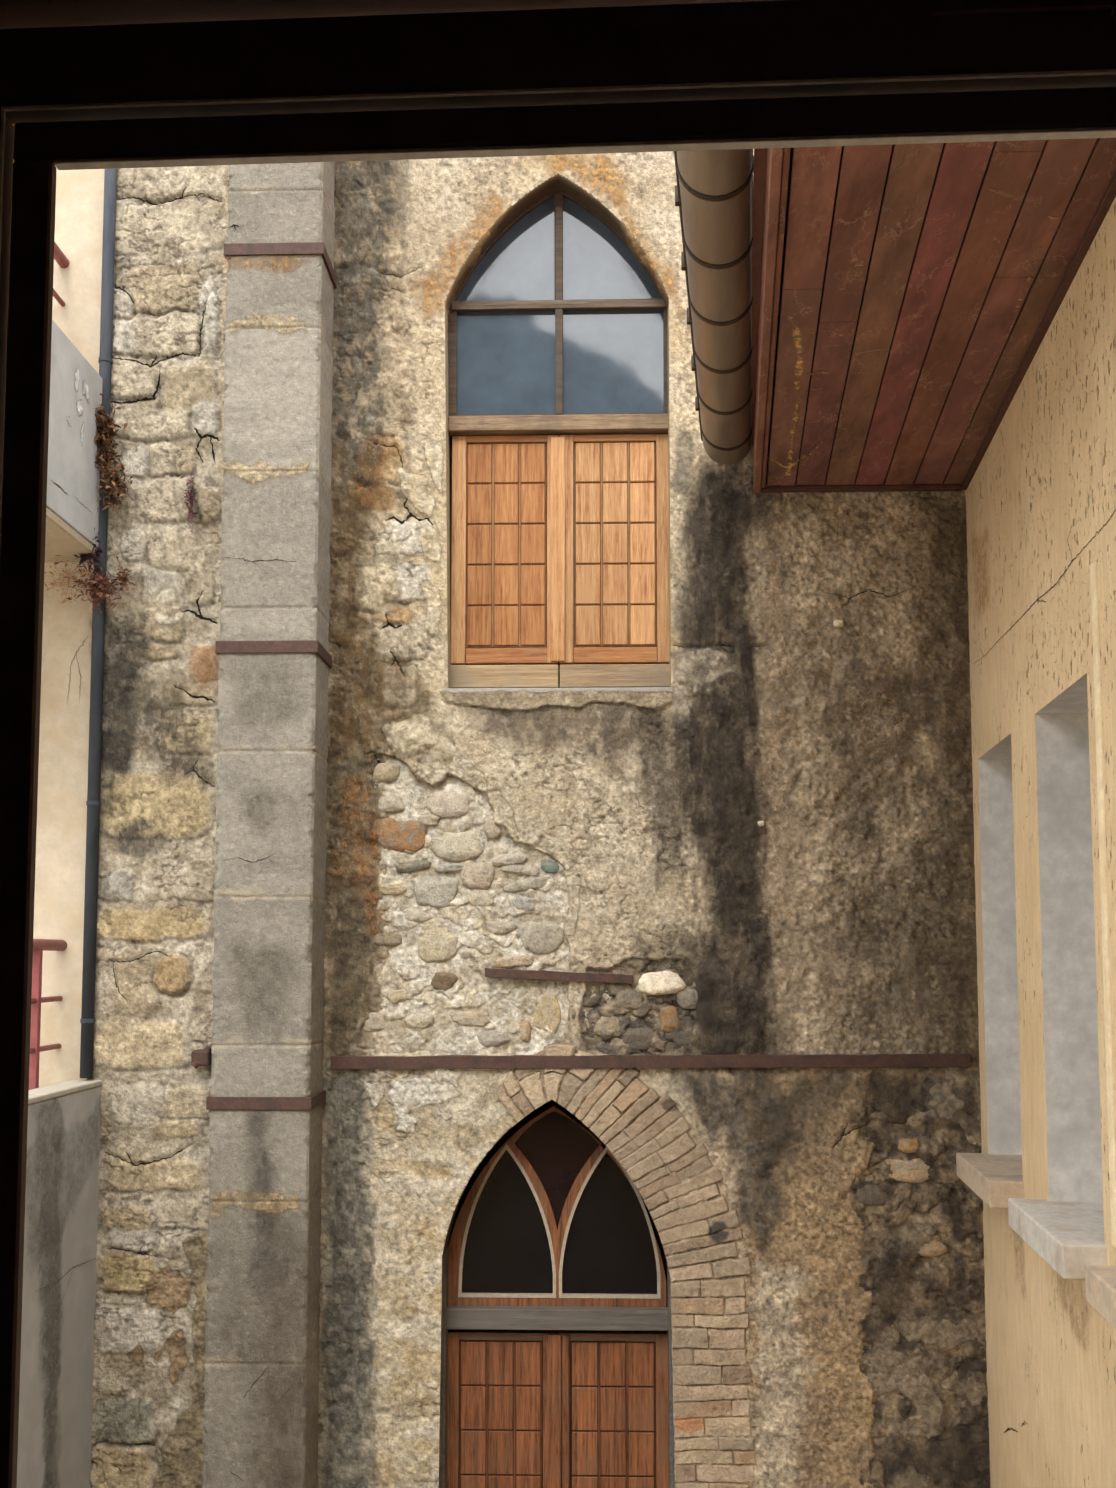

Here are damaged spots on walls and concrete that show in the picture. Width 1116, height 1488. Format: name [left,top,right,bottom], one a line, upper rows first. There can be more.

leakage [30,1100,97,1488]
flaking render [363,755,698,1133]
leakage [485,432,933,1251]
leakage [822,498,986,1062]
flaking render [849,1079,988,1488]
leakage [951,1082,981,1137]
crack [973,509,1116,664]